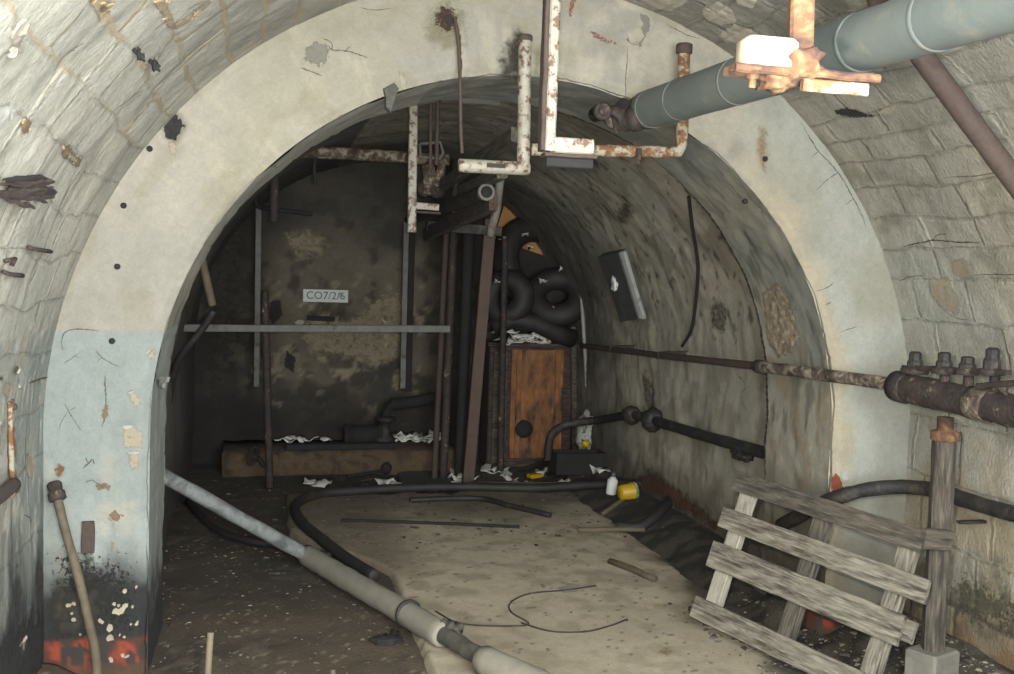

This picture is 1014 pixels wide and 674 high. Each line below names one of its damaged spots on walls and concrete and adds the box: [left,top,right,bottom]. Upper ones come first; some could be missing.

corrosion [430,3,462,69]
leakage [0,545,144,674]
leakage [954,572,1014,638]